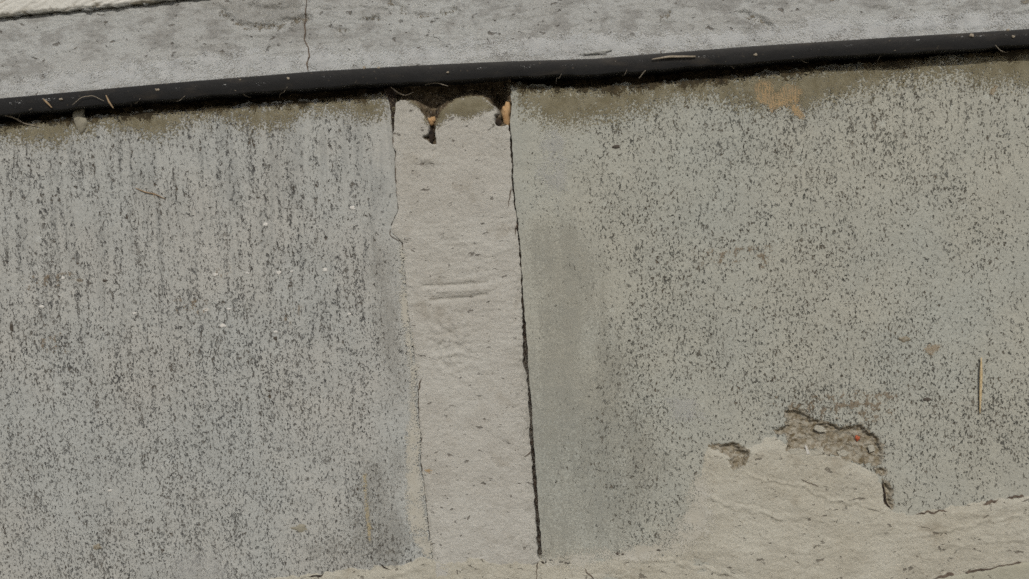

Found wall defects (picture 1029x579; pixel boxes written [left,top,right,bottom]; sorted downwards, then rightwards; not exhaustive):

crack [384,86,404,259]
crack [508,127,594,579]
spalling [708,441,750,474]
spalling [774,407,895,510]